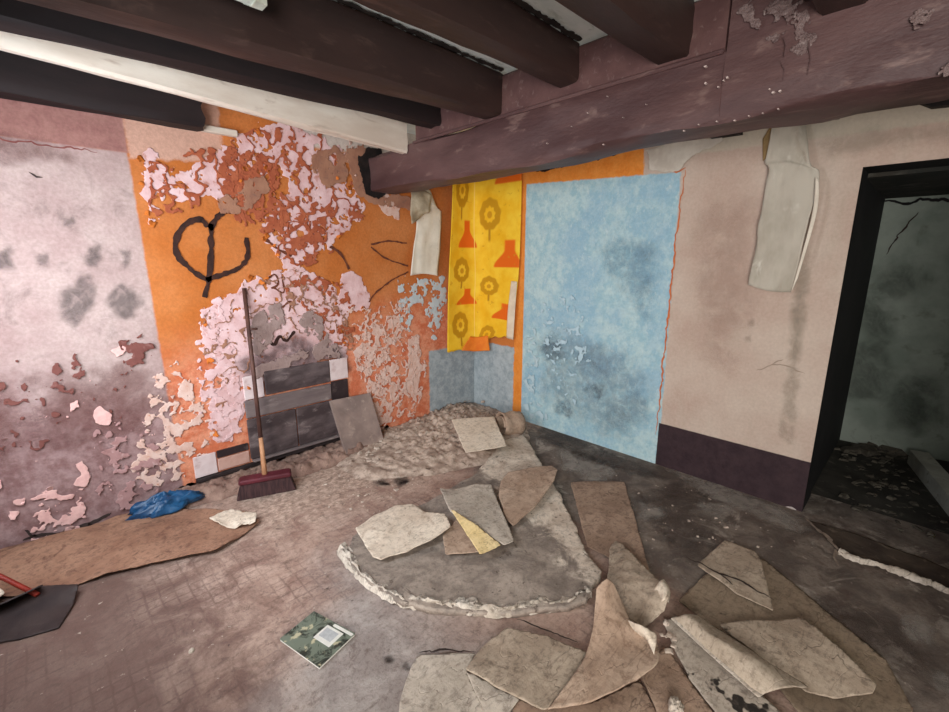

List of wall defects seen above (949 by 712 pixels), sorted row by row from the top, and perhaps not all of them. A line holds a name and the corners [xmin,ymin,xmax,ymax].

peeling [736,0,817,56]
peeling [909,8,935,30]
crack [885,197,949,254]
leakage [62,289,92,322]
leakage [111,286,136,317]
peeling [136,122,447,443]
flaking render [0,353,122,425]
flaking render [111,334,155,392]
peeling [0,430,50,451]
peeling [8,461,91,541]